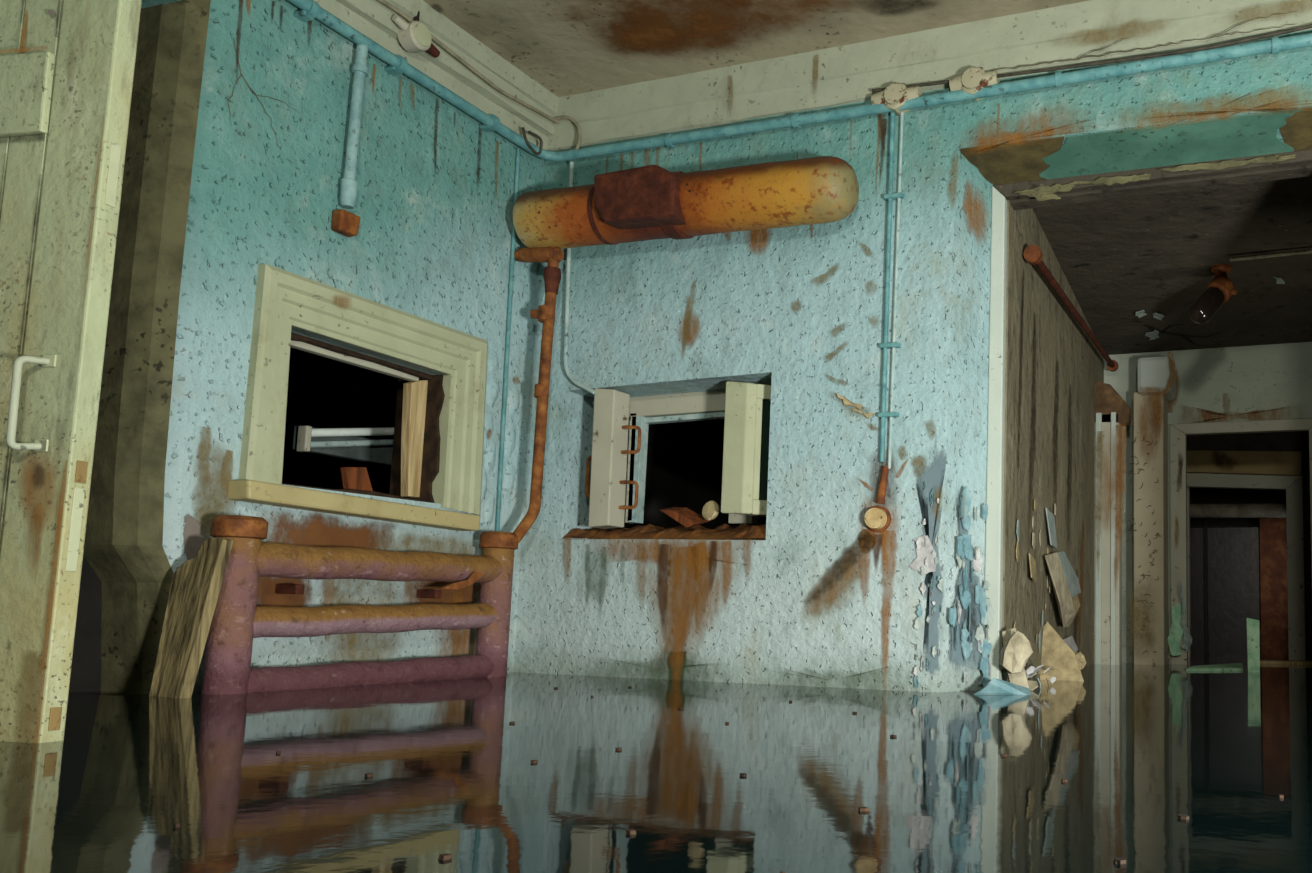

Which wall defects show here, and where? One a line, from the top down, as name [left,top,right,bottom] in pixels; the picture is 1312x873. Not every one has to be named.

leakage [610,0,831,51]
leakage [873,0,931,14]
corrosion [1140,90,1294,127]
peeling [959,107,1312,201]
corrosion [683,284,698,351]
corrosion [860,462,906,497]
corrosion [611,540,731,676]
corrosion [861,516,895,662]
peeling [900,448,995,688]